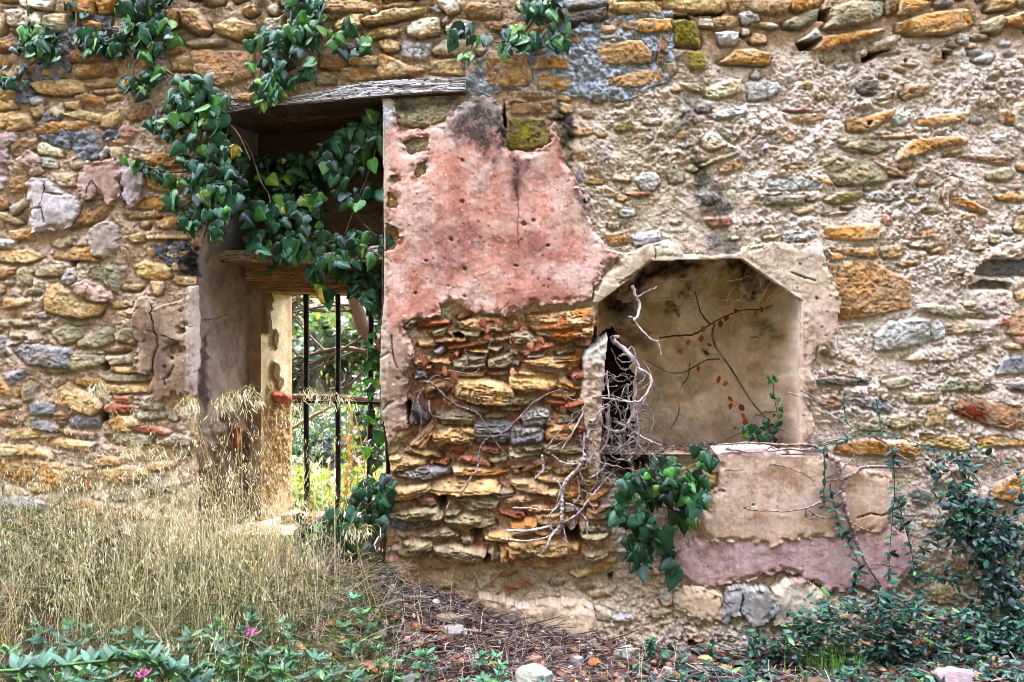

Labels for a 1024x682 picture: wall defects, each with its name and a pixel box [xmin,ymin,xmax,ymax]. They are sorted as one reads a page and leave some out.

damp [437,96,530,197]
crack [146,304,244,384]
peeling [380,95,917,626]